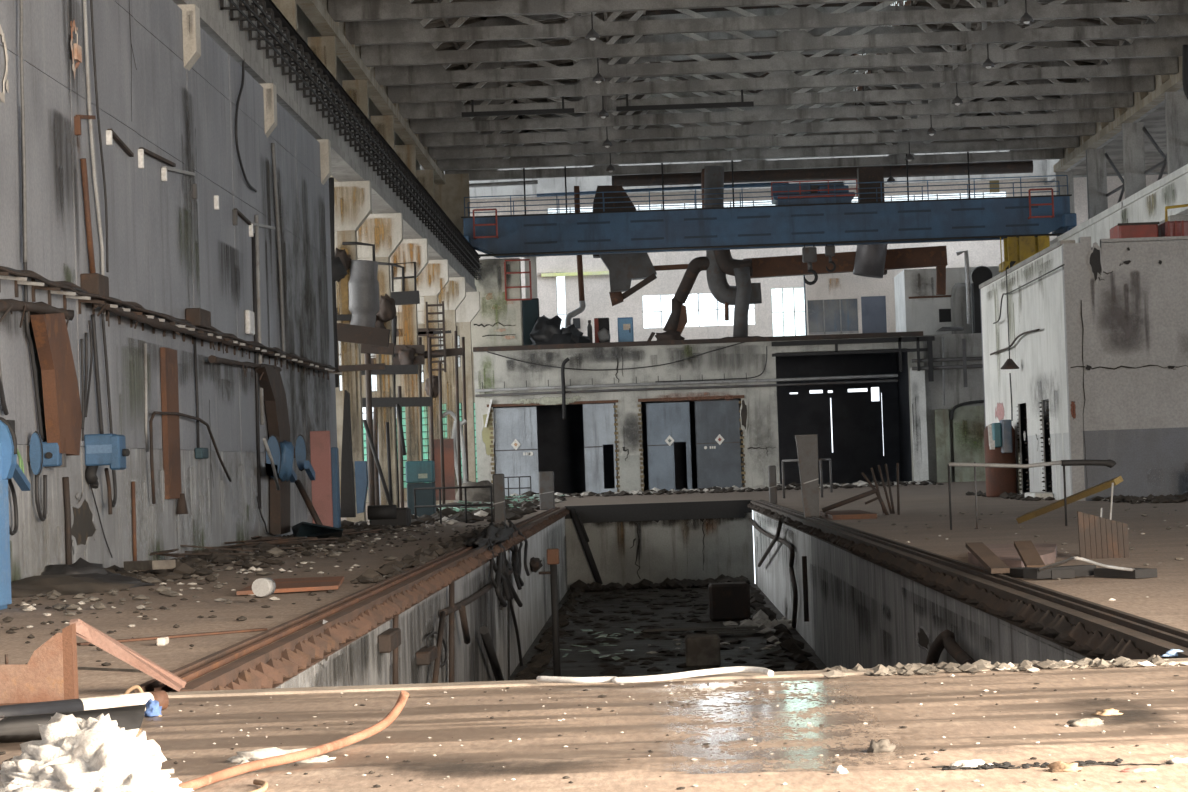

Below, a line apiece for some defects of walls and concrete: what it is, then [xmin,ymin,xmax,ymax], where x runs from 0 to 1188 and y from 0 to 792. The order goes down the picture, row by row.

water stain [54,0,84,242]
corrosion [334,187,364,217]
corrosion [358,218,390,247]
corrosion [337,269,350,324]
corrosion [398,304,413,345]
corrosion [377,243,454,304]
water stain [1091,272,1148,348]
corrosion [341,341,357,382]
crack [1070,262,1188,476]
spalling [70,490,98,554]